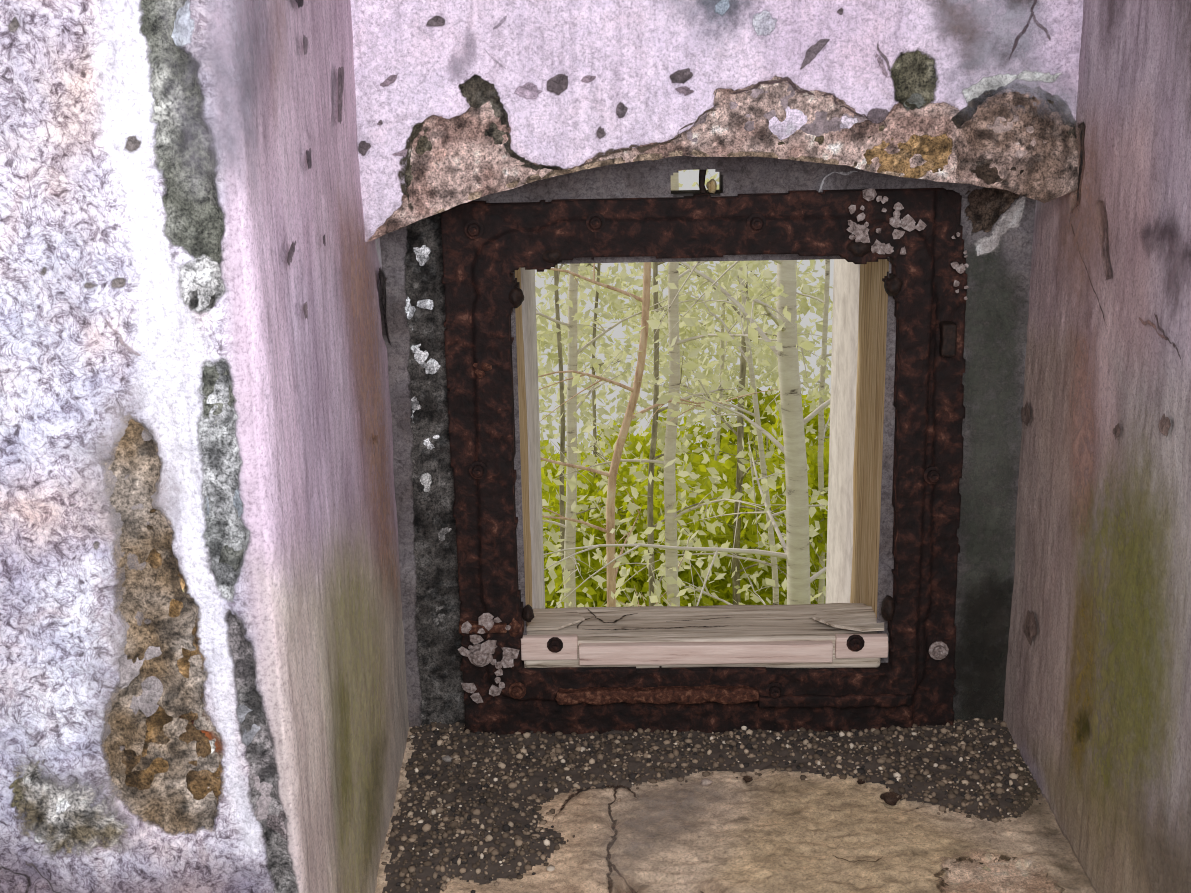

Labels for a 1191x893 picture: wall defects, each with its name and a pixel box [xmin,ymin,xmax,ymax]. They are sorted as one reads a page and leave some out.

peeling [800,39,830,69]
spalling [1071,122,1086,213]
flaking render [368,44,1026,726]
flaking render [9,414,223,855]
crack [553,785,636,893]